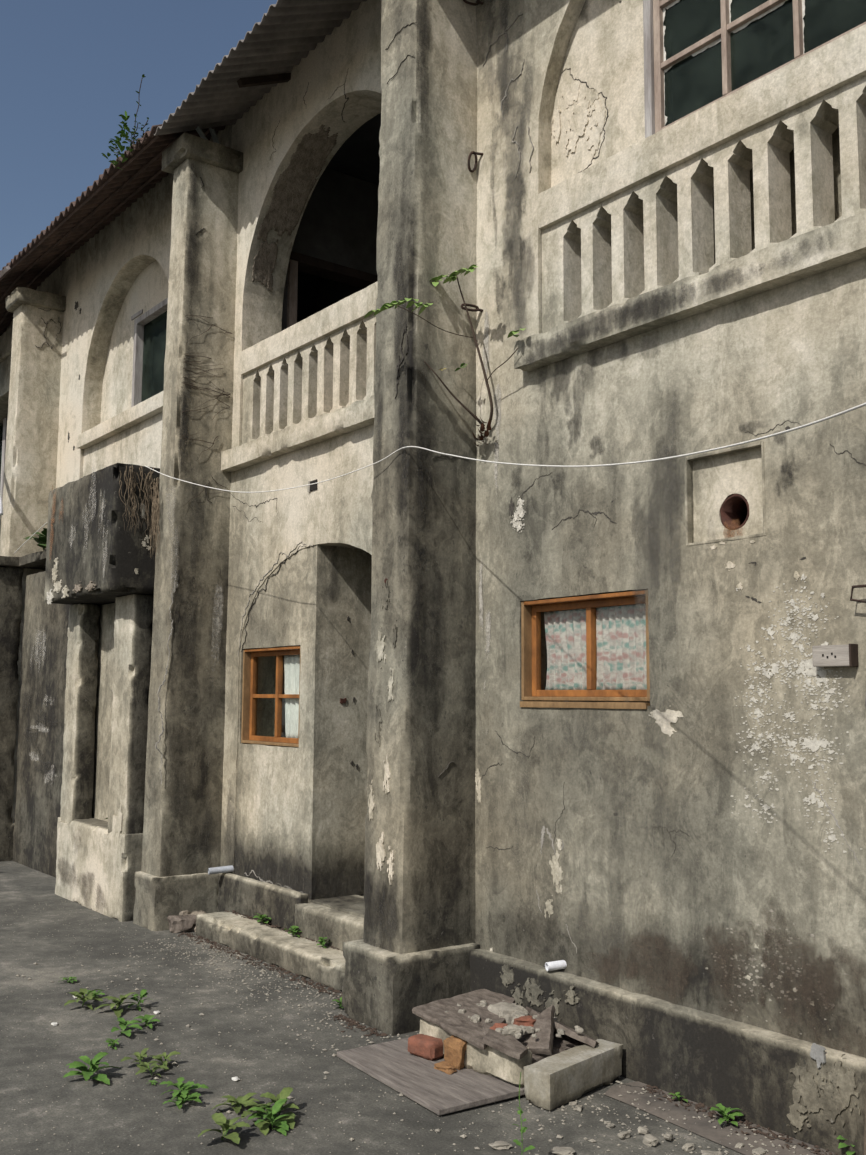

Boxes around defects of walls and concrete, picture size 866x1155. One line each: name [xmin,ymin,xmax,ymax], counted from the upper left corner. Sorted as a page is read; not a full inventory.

leakage [416,1,430,110]
flaking render [252,125,338,292]
spalling [509,496,526,533]
crack [552,509,617,530]
peeling [47,557,97,605]
crack [241,545,314,652]
flaking render [368,620,398,821]
spalling [648,706,683,737]
peeling [731,557,862,857]
flaking render [376,832,394,885]
leakage [536,826,564,919]
flaking render [499,964,580,1022]